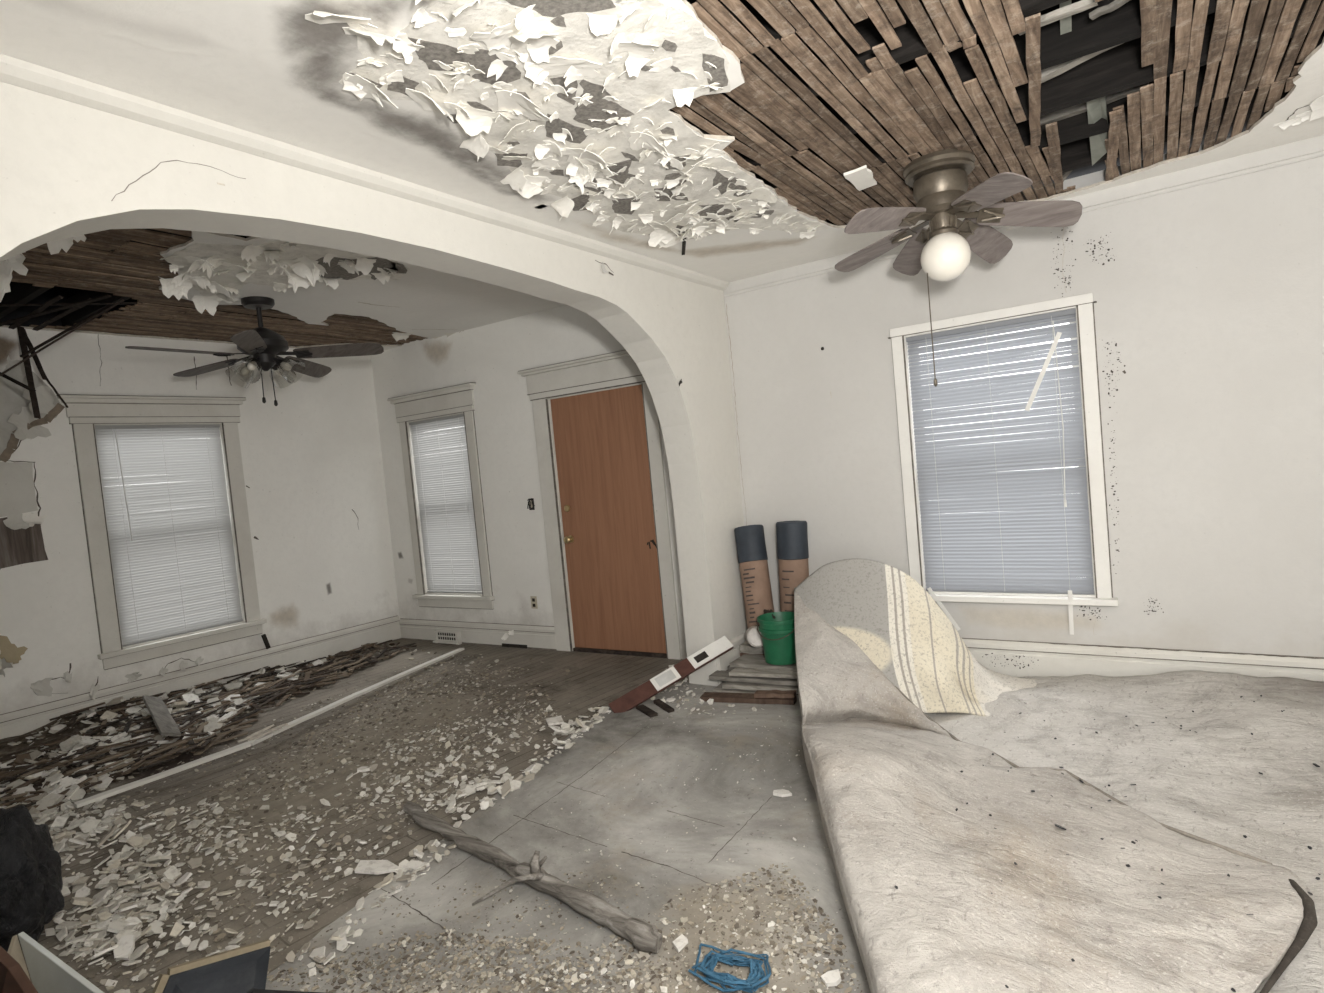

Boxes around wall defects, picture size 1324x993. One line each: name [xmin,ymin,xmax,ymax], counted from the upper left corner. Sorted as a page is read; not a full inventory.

crack [111,160,246,201]
damp [3,0,830,262]
flaking render [305,0,1324,255]
damp [1051,227,1115,297]
flaking render [0,228,427,569]
damp [1102,342,1126,574]
peeling [0,635,28,677]
peeling [30,663,73,697]